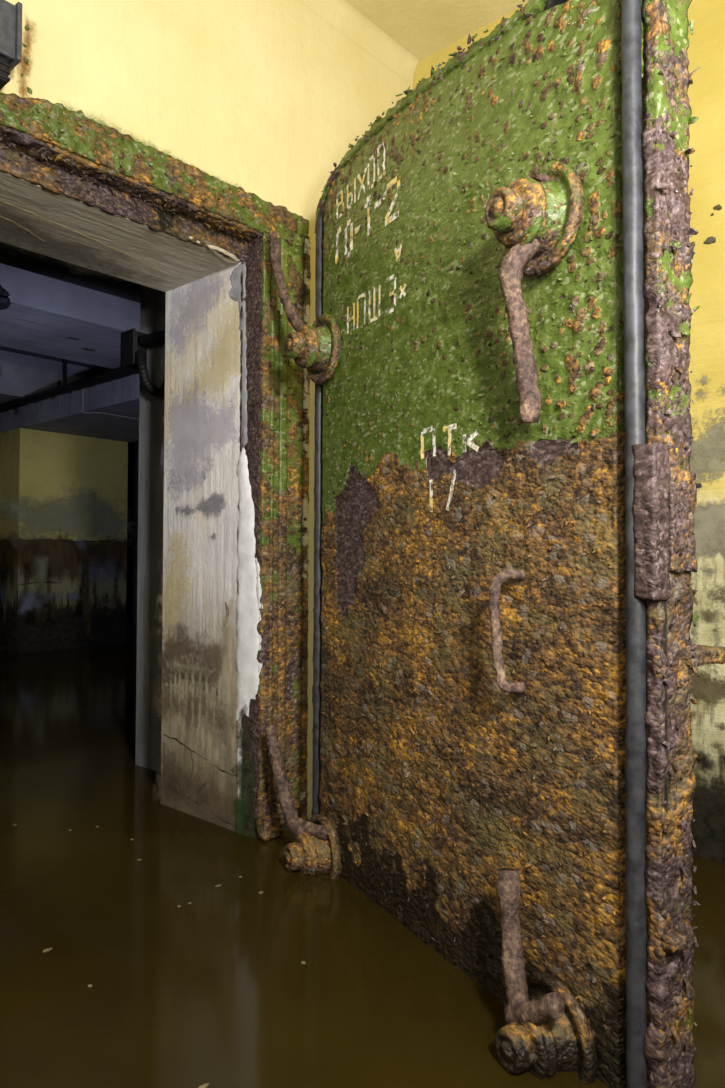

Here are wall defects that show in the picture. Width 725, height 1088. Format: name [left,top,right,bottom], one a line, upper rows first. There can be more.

rust [19,21,33,98]
peeling [330,29,488,173]
rust [0,133,262,245]
spalling [0,284,11,310]
peeling [188,236,248,447]
peeling [669,293,700,338]
peeling [663,228,716,276]
leakage [170,320,239,489]
leakage [690,409,725,489]
leakage [0,536,130,653]
leakage [155,538,239,765]
leakage [691,744,725,864]